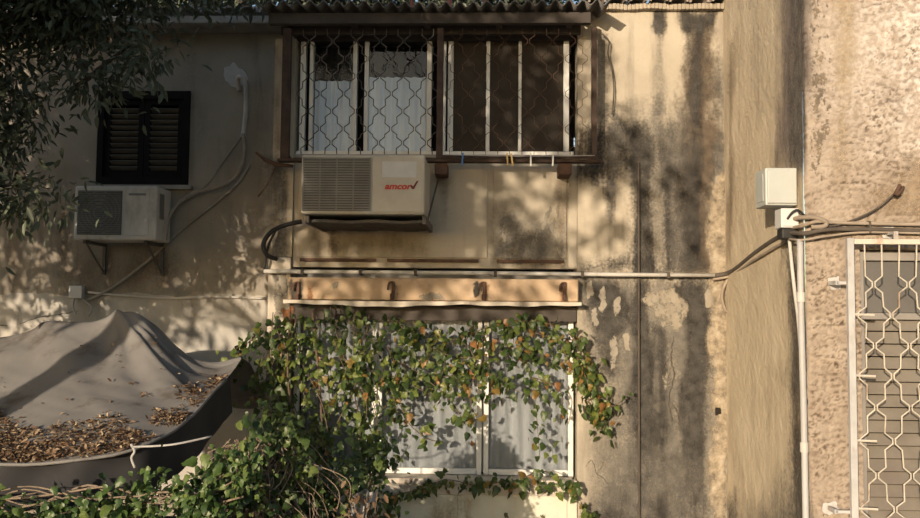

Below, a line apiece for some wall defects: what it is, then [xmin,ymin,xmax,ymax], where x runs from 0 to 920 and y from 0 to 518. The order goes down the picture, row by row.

leakage [775,0,808,168]
leakage [499,216,556,260]
leakage [576,10,731,518]
peeling [586,281,621,326]
peeling [642,288,688,331]
peeling [610,333,630,370]